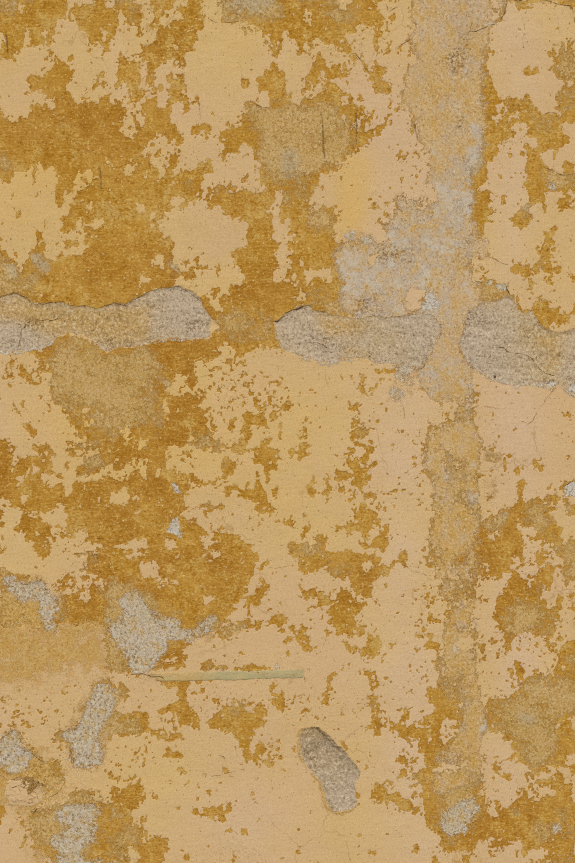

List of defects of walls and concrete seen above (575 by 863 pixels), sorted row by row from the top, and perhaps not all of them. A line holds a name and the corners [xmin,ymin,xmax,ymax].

peeling [23,423,37,440]
peeling [195,499,225,523]
peeling [200,659,279,673]
peeling [268,682,326,721]
peeling [317,663,350,716]
spalling [292,727,369,816]